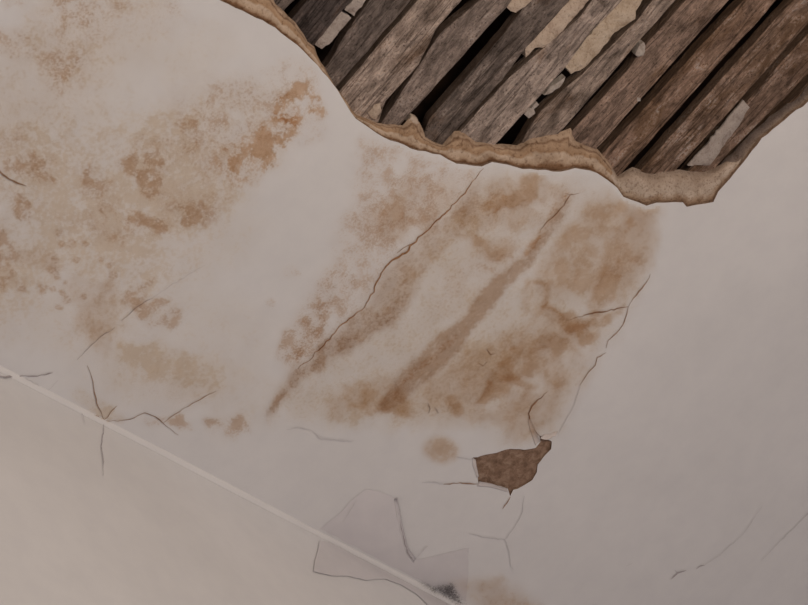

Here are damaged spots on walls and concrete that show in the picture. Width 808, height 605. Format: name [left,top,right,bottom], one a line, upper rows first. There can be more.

flaking render [223,0,808,205]
crack [77,266,216,474]
crack [298,168,484,369]
flaking render [473,392,558,494]
crack [558,276,650,434]